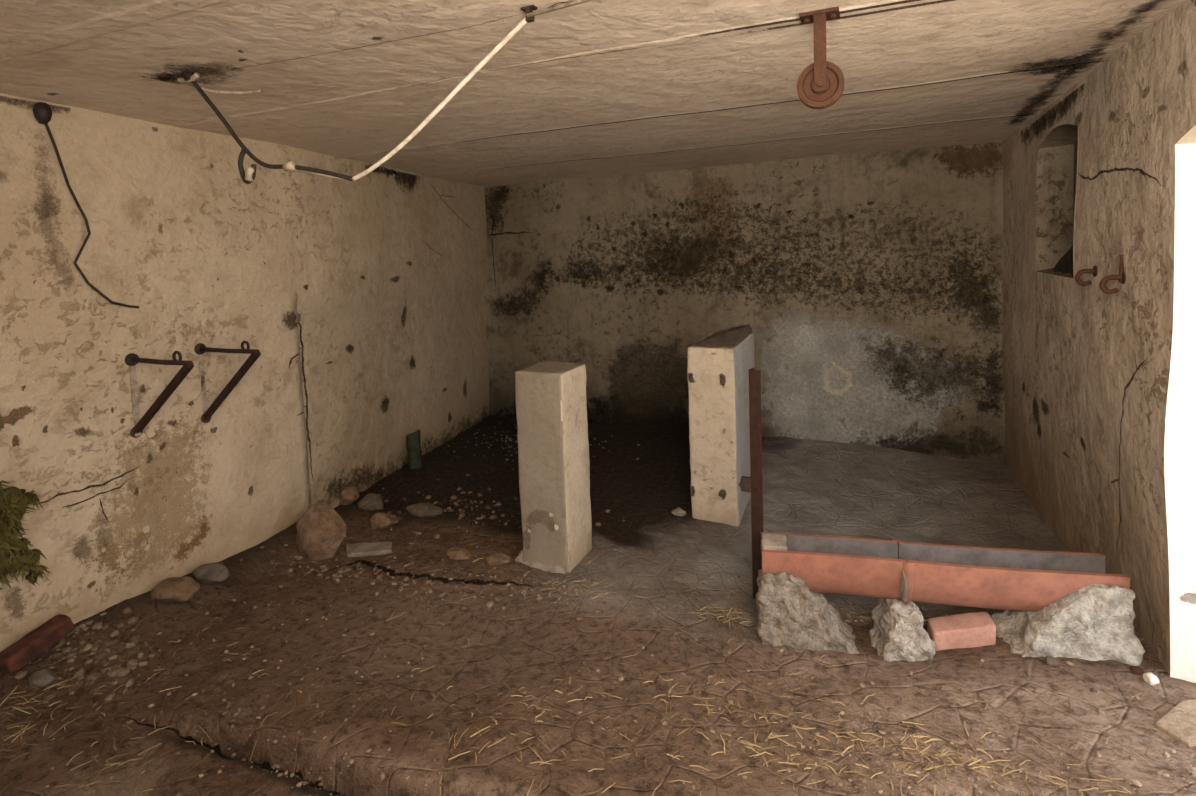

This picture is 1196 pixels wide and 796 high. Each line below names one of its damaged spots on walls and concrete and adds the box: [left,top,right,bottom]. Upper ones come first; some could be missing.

leakage [144,63,241,84]
leakage [491,190,1004,459]